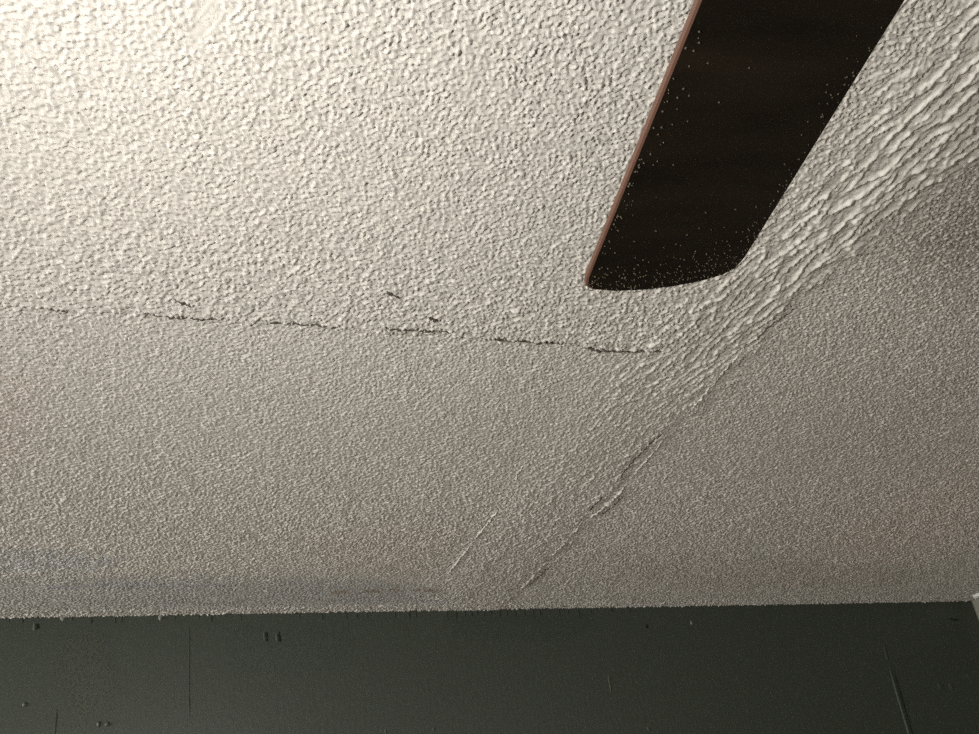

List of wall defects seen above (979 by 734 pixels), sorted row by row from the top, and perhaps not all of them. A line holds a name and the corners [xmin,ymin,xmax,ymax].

crack [144,299,224,321]
crack [267,321,336,329]
crack [382,317,660,353]